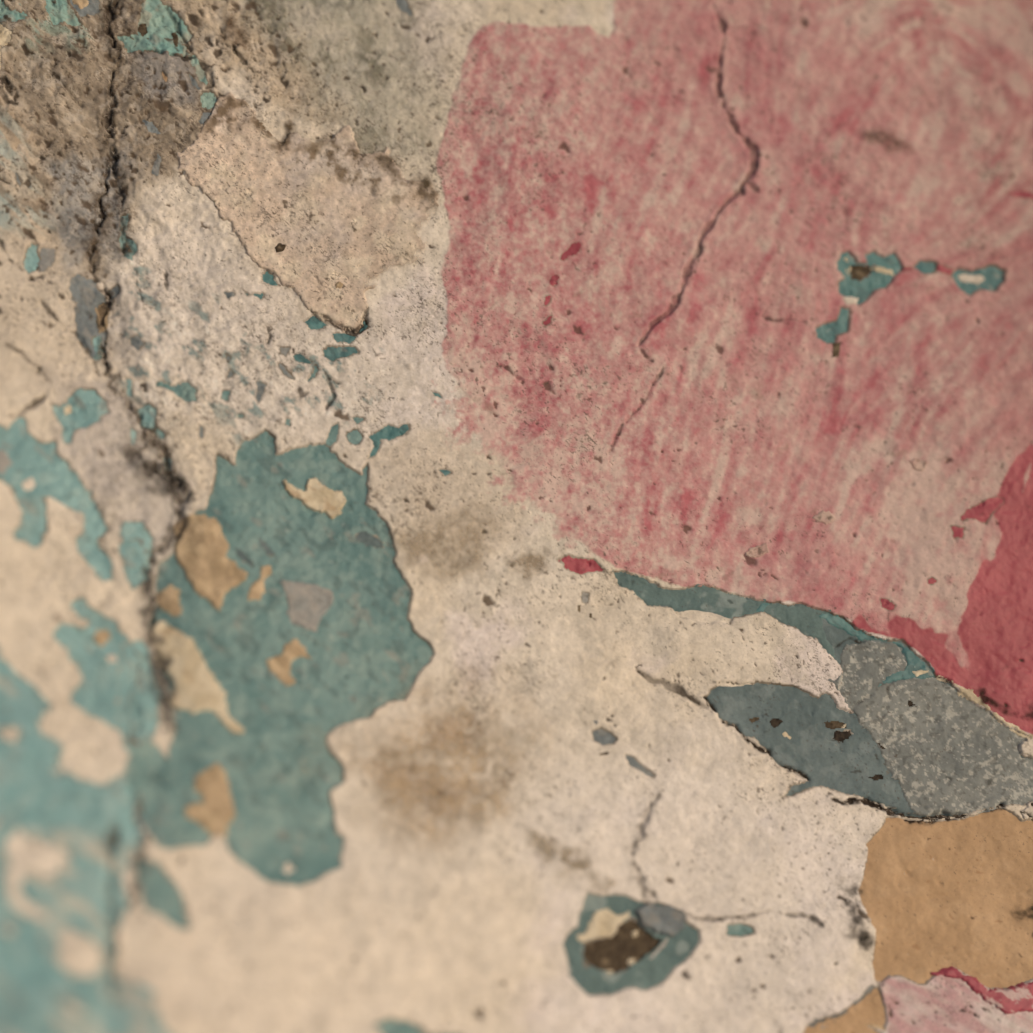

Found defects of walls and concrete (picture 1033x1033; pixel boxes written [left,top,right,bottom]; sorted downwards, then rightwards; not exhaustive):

peeling [0,0,28,70]
peeling [45,0,100,30]
crack [177,31,210,88]
spalling [816,252,1003,357]
crack [86,0,196,728]
spalling [156,381,197,402]
spalling [256,382,266,403]
spalling [951,497,1003,539]
peeling [0,389,433,1033]
peeling [558,555,1033,1033]
crack [104,787,148,1000]